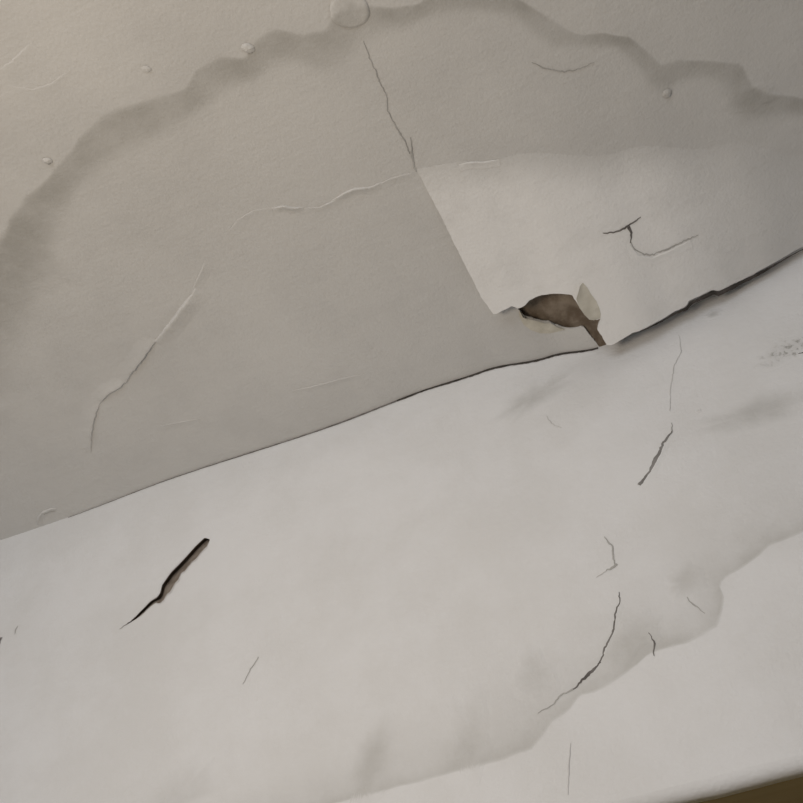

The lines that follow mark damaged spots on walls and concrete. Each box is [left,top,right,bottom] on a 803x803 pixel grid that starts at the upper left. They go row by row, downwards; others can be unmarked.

crack [363,41,417,172]
water stain [0,0,803,442]
peeling [416,142,803,345]
crack [604,217,698,266]
crack [638,337,682,489]
crack [538,592,626,713]